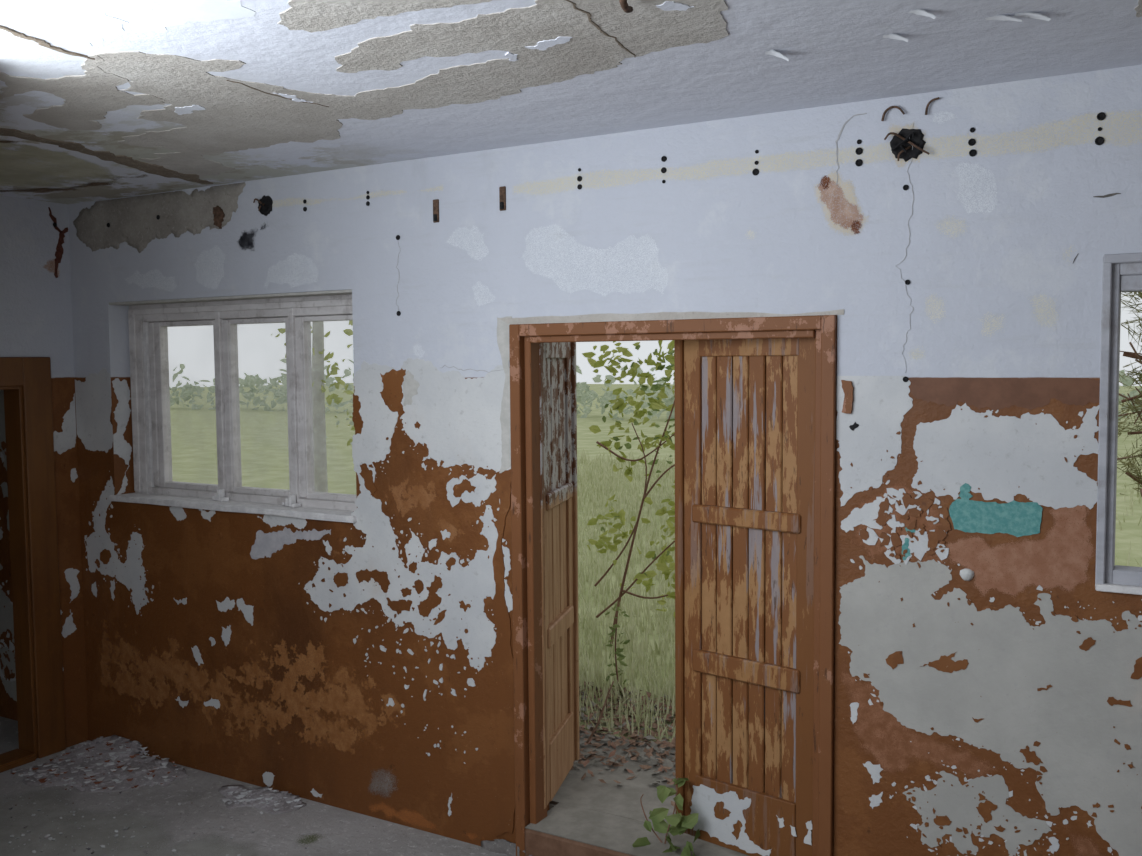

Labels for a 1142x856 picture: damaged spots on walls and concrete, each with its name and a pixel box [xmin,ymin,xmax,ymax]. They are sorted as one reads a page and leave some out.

crack [0,25,95,60]
peeling [505,36,572,61]
crack [565,0,635,56]
crack [0,128,213,184]
damp [512,142,894,196]
damp [921,109,1142,160]
flaking render [73,182,246,253]
peeling [53,368,154,638]
peeling [170,507,216,522]
peeling [216,597,254,626]
peeling [836,376,1142,856]
peeling [99,615,407,755]